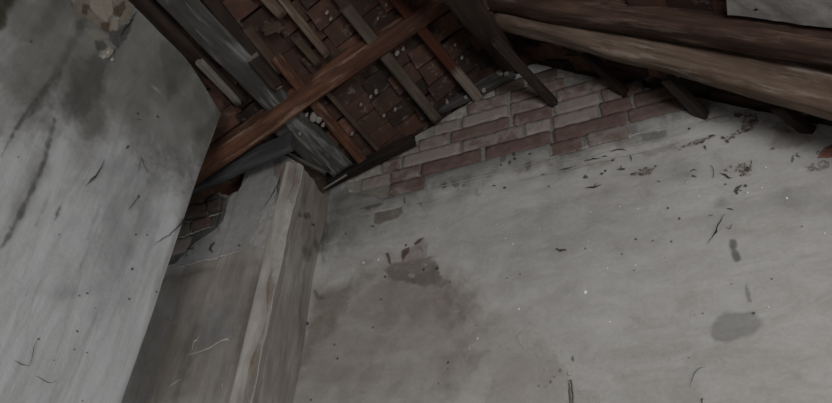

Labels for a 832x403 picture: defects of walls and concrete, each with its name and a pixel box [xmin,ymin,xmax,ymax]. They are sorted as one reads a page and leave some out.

flaking render [71,0,136,61]
flaking render [345,67,687,227]
flaking render [168,160,315,280]